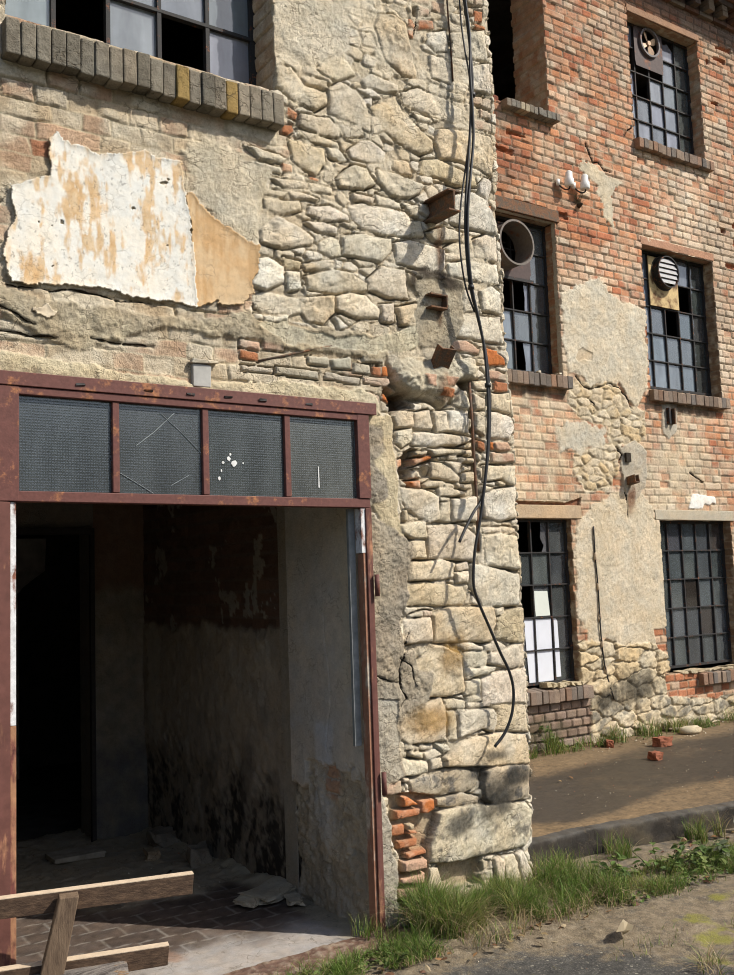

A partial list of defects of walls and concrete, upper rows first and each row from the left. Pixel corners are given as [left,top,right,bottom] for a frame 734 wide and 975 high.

peeling [0,131,390,359]
flaking render [560,278,649,406]
flaking render [555,420,607,455]
crack [377,634,418,709]